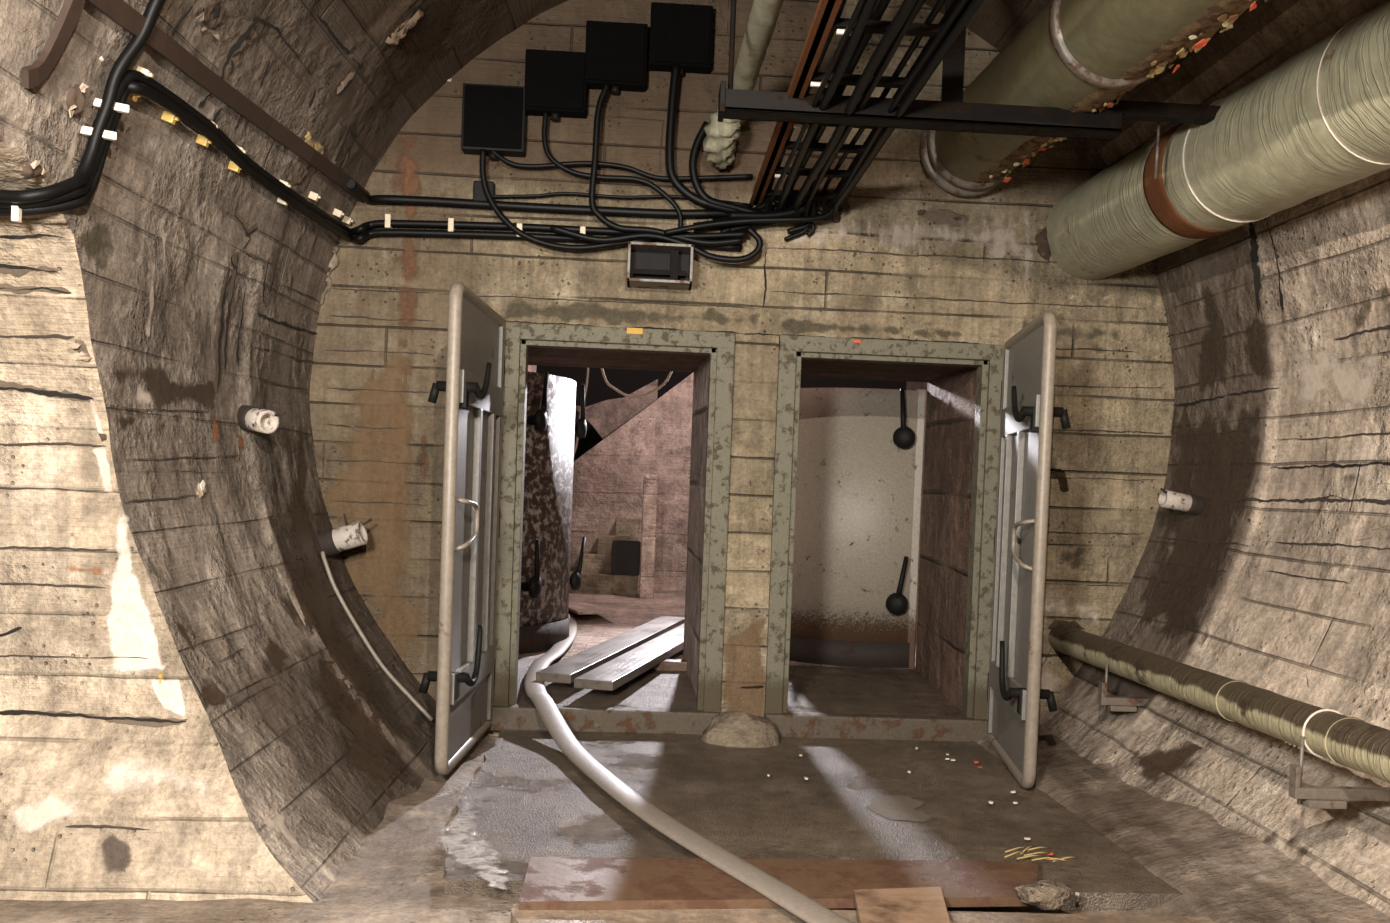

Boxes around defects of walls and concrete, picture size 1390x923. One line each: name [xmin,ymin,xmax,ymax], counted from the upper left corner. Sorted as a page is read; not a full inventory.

crack [198,0,430,161]
corrosion [392,138,420,218]
corrosion [400,236,417,325]
crack [1249,222,1284,313]
crack [1056,346,1134,354]
crack [1334,325,1390,340]
water stain [119,417,134,430]
water stain [116,366,215,420]
crack [1052,385,1278,434]
crack [1221,432,1390,505]
crack [1048,532,1390,583]
water stain [102,835,130,871]